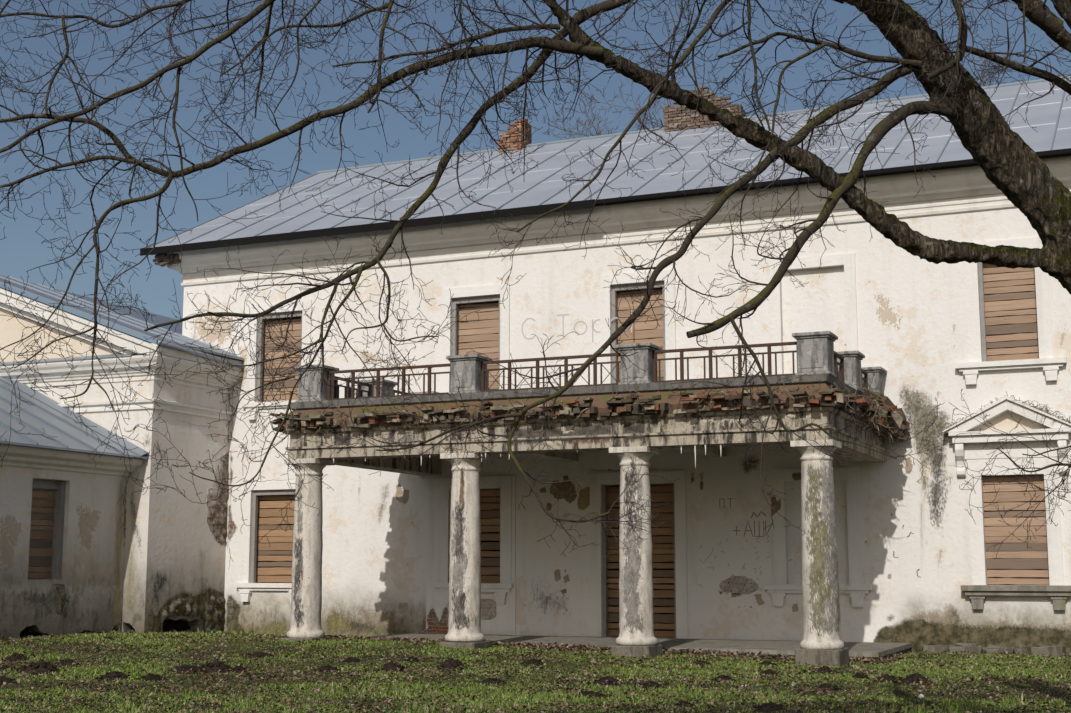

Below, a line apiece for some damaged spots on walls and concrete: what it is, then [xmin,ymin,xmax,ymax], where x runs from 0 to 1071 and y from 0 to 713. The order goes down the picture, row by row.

spalling [163,595,245,633]
flaking render [206,450,238,548]
flaking render [417,605,449,634]
damp [450,468,477,629]
peeling [540,475,590,511]
damp [622,457,644,631]
flaking render [718,576,765,608]
damp [803,462,840,635]
damp [900,389,948,519]